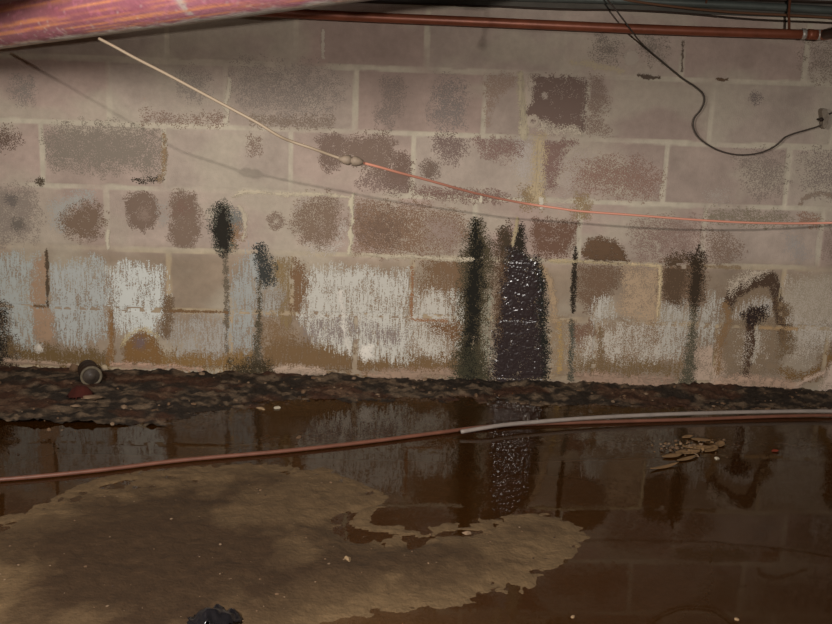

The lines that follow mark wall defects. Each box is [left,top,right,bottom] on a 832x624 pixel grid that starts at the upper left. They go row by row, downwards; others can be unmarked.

damp [175,62,214,105]
damp [425,32,671,207]
damp [0,73,832,391]